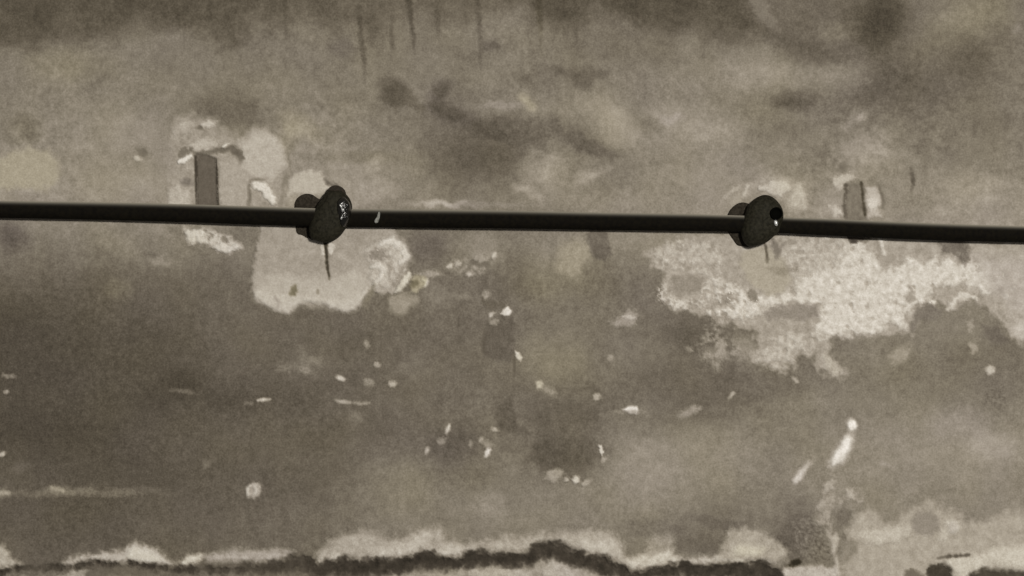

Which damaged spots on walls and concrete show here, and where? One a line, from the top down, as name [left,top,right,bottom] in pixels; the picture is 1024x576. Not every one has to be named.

leakage [0,0,795,164]
peeling [161,108,402,209]
peeling [167,222,499,319]
leakage [639,231,1024,384]
leakage [311,417,1024,576]
leakage [0,541,25,569]
leakage [60,538,299,566]